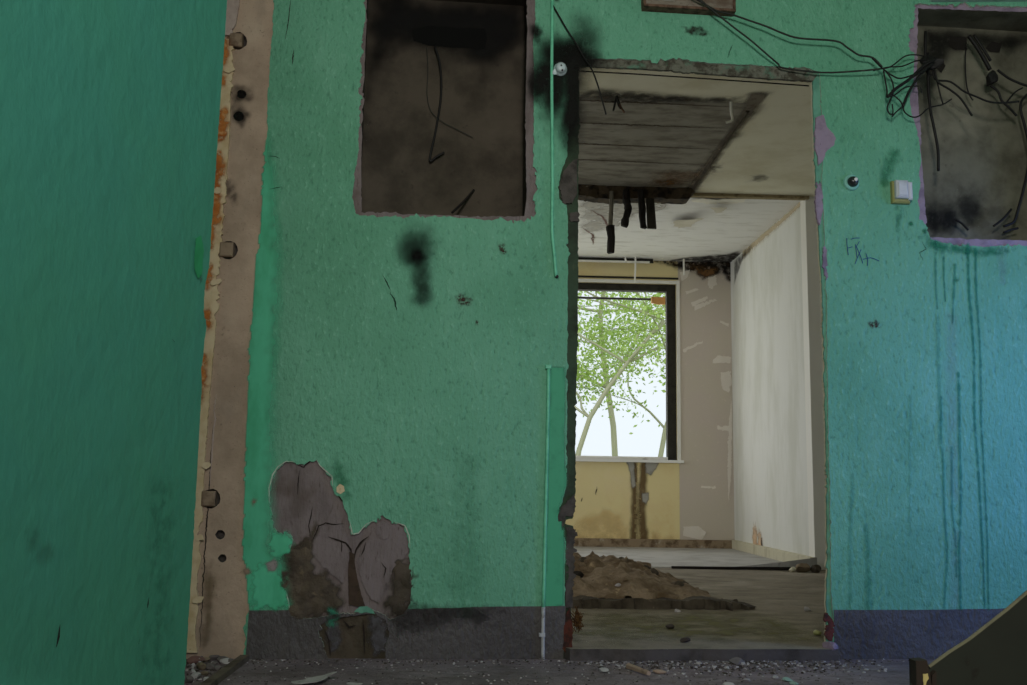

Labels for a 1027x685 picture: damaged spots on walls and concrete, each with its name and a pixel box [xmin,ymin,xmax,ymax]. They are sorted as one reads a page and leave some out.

flaking render [813,115,836,166]
leakage [909,222,1000,610]
flaking render [250,460,414,659]